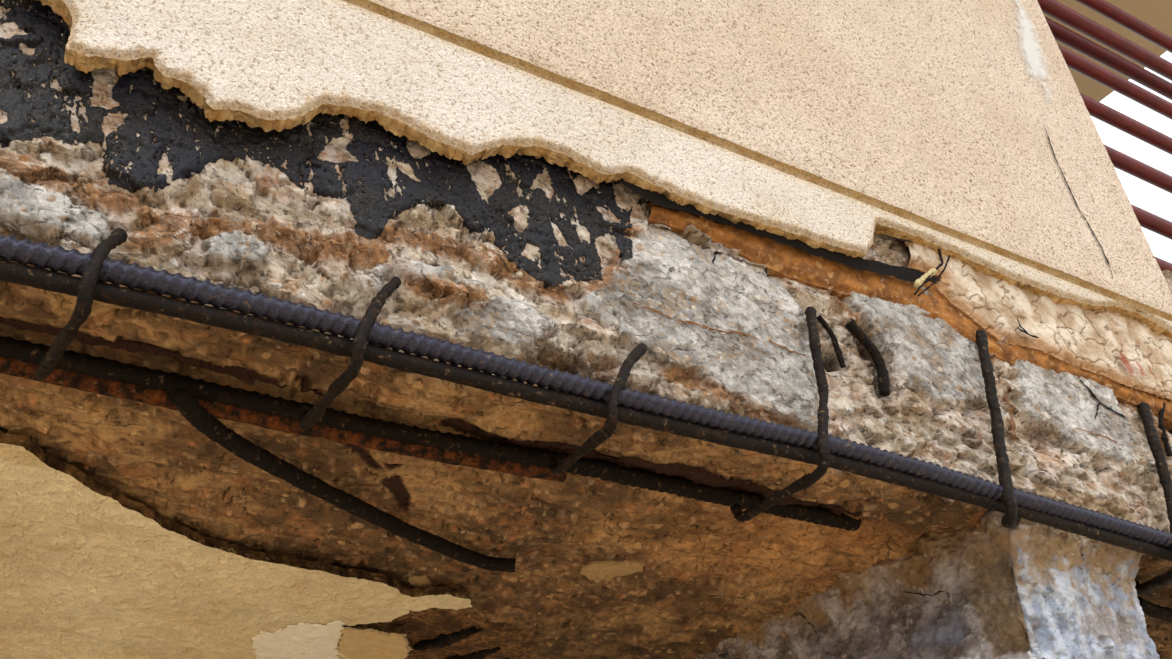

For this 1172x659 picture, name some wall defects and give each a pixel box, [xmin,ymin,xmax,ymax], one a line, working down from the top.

rust [0,316,61,336]
rust [74,332,322,399]
spalling [0,0,999,485]
crack [1042,121,1113,277]
spalling [1162,270,1172,294]
rust [343,443,410,511]
spalling [0,280,991,659]
rust [438,418,860,516]
spalling [990,337,1172,532]
spalling [1135,554,1172,659]